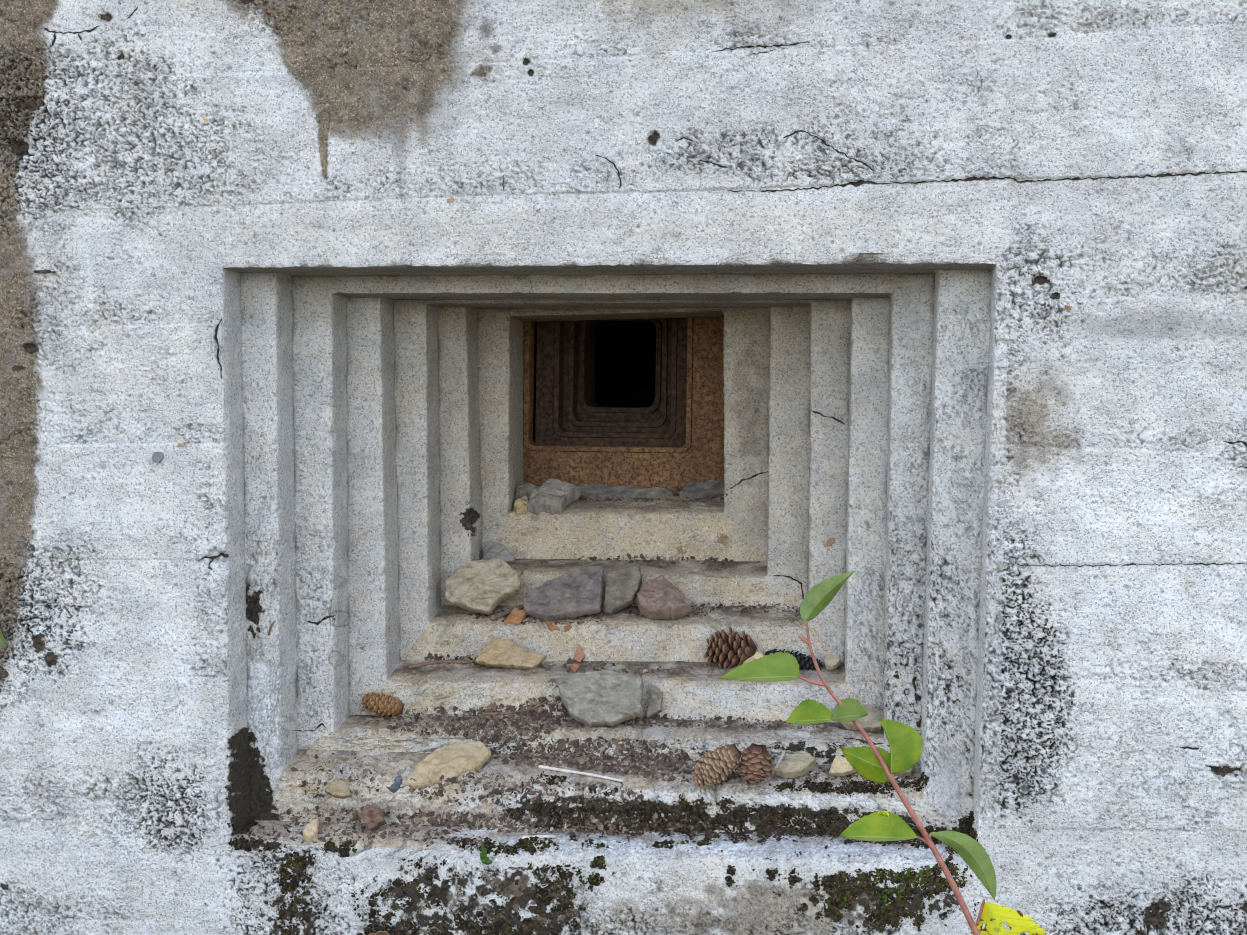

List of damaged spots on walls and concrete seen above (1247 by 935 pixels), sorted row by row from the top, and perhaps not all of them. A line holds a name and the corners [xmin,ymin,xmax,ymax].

leakage [223,0,466,178]
crack [677,130,1247,192]
leakage [0,0,58,668]
leakage [346,620,976,935]